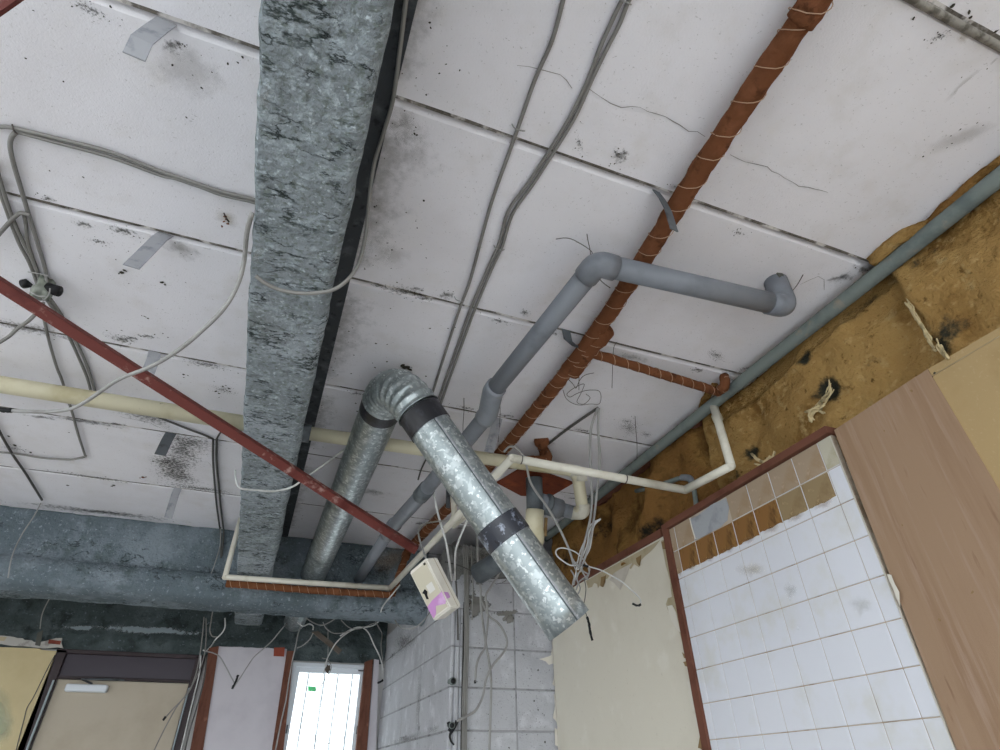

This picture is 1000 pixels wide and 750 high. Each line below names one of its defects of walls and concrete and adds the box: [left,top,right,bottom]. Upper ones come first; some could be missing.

crack [517,65,705,137]
crack [731,155,825,192]
damp [152,438,214,491]
peeling [689,498,729,540]